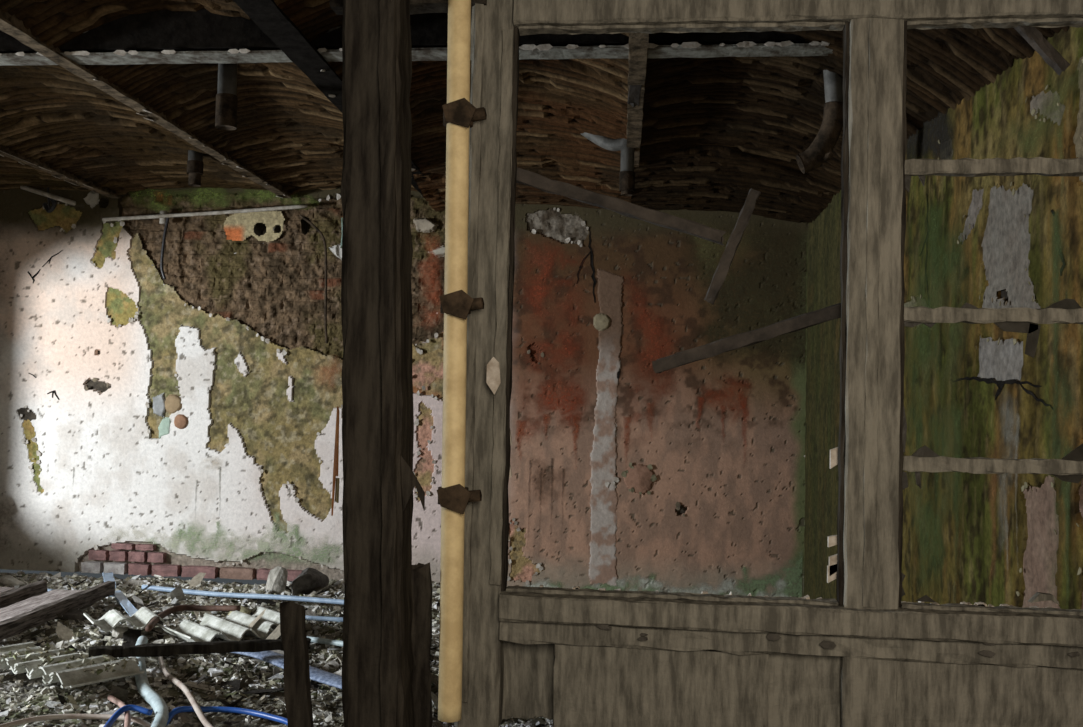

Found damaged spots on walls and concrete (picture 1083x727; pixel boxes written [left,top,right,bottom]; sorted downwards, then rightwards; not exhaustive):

peeling [1025,85,1065,126]
peeling [1073,57,1083,158]
peeling [957,182,1041,309]
flaking render [84,378,111,393]
peeling [90,194,343,533]
flaking render [401,196,445,512]
peeling [976,335,1023,382]
flaking render [75,541,344,582]
peeling [1016,475,1060,609]